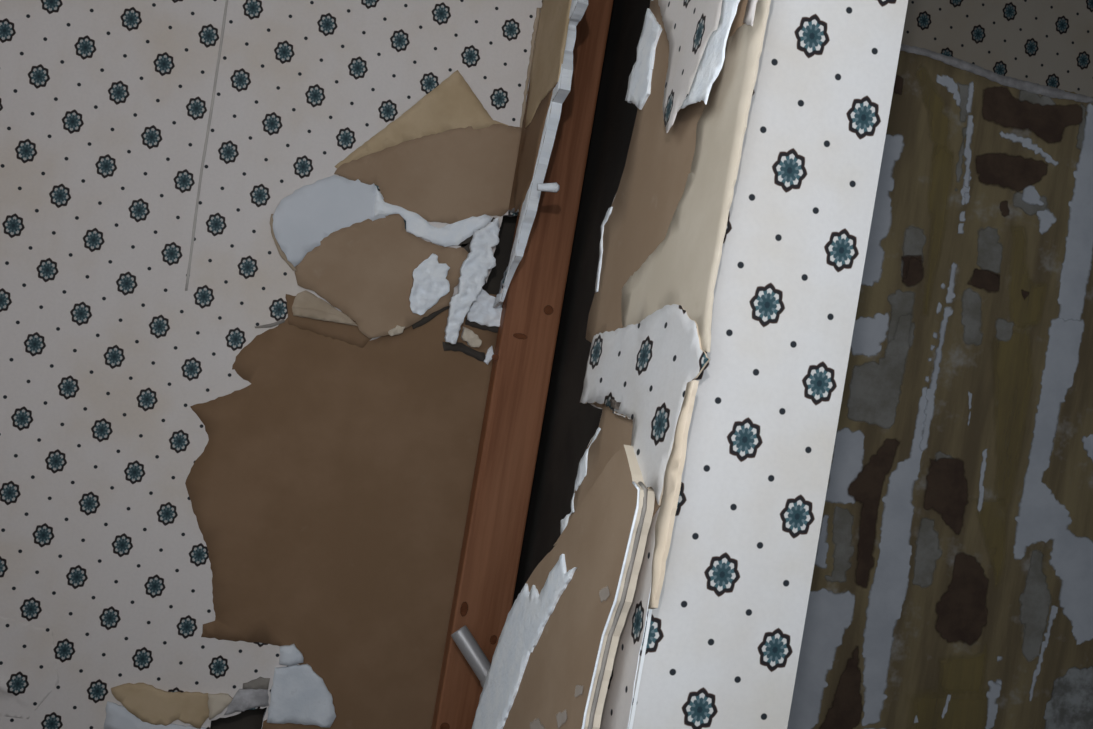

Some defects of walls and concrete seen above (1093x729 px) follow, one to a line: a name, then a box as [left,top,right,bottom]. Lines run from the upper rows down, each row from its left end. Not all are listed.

leakage [894,75,903,95]
leakage [982,87,1083,143]
leakage [902,68,953,313]
leakage [976,153,1048,217]
leakage [968,269,1000,292]
leakage [848,439,900,588]
leakage [916,327,1031,729]
spalling [104,677,270,729]
leakage [819,646,862,729]